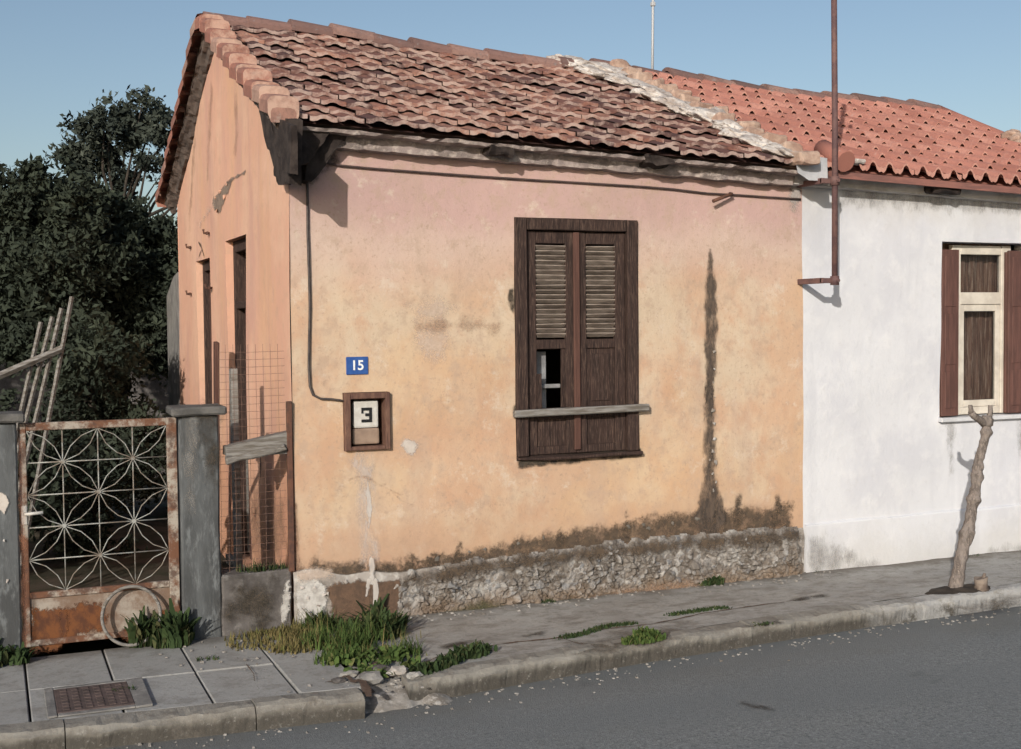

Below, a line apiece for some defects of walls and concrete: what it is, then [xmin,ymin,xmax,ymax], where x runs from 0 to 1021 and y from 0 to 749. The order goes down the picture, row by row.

spalling [212,170,246,213]
damp [299,253,800,604]
peeling [0,492,9,513]
rust [19,440,109,655]
spalling [294,526,803,625]